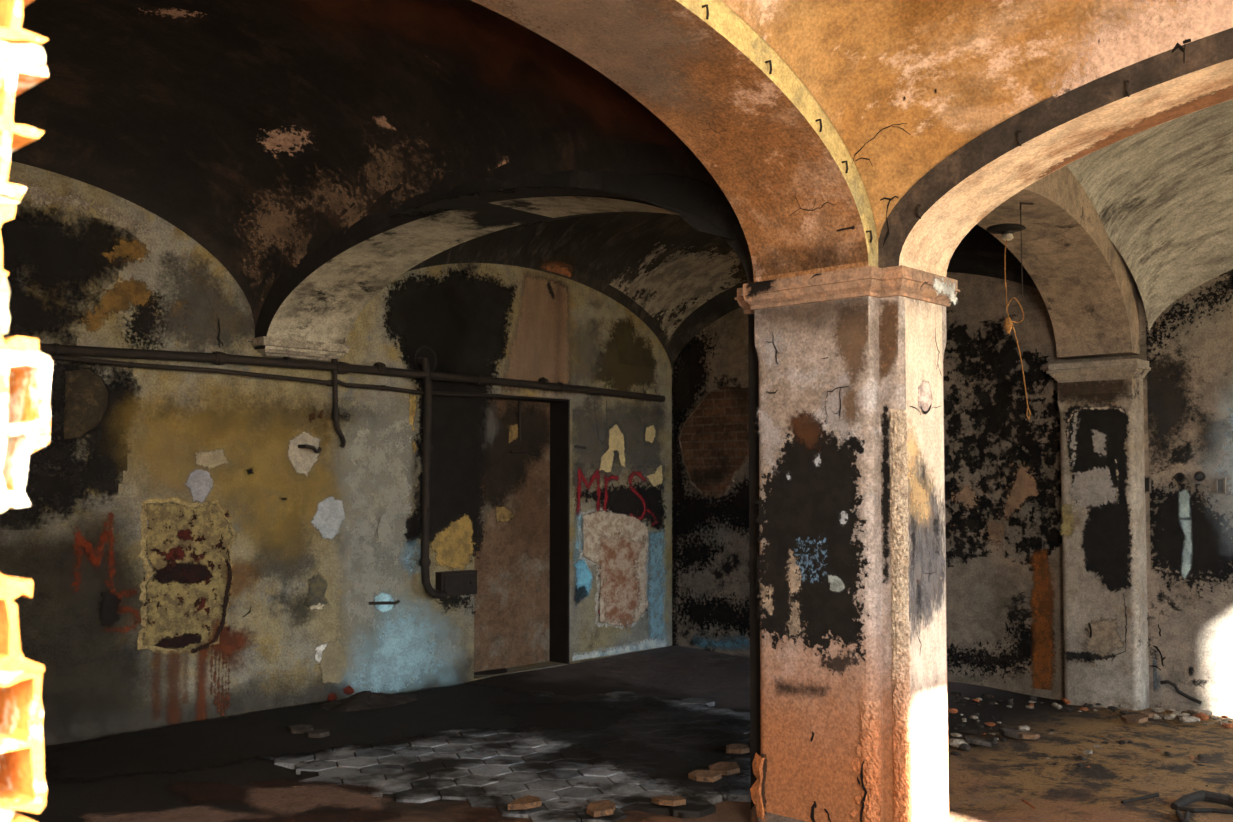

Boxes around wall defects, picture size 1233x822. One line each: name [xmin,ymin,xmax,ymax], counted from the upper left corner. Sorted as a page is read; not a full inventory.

crack [852,123,911,167]
peeling [229,116,451,314]
flaking render [679,386,783,499]
flaking render [137,449,238,656]
peeling [430,512,476,571]
flaking render [577,507,649,629]
damp [758,549,805,639]
peeling [828,575,845,592]
spalling [851,381,932,822]
damp [1030,550,1055,690]
damp [1179,490,1192,578]
flaking render [750,753,767,819]